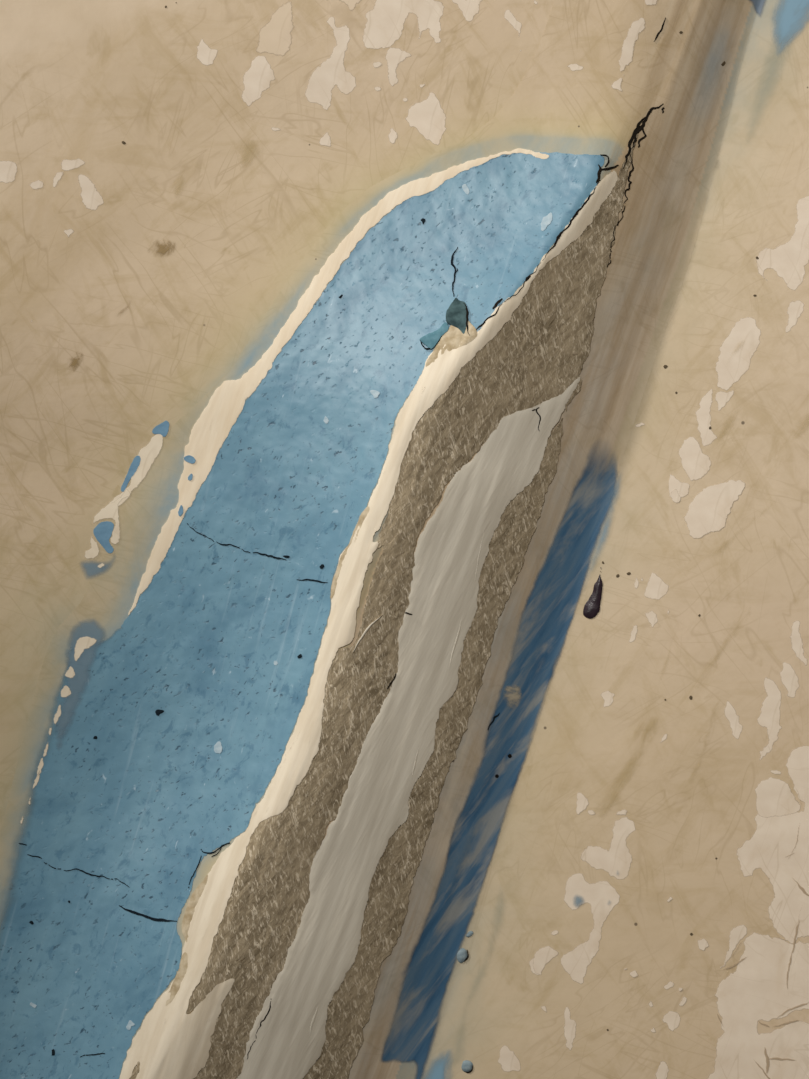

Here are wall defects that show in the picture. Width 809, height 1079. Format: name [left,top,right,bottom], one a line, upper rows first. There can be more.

peeling [242,2,294,106]
peeling [305,17,356,110]
peeling [341,0,482,91]
peeling [403,84,446,145]
crack [450,247,458,297]
crack [476,104,664,330]
peeling [756,196,809,332]
peeling [669,317,761,538]
crack [187,523,327,583]
peeling [0,132,638,1079]
crack [19,843,173,922]
peeling [708,746,809,1079]